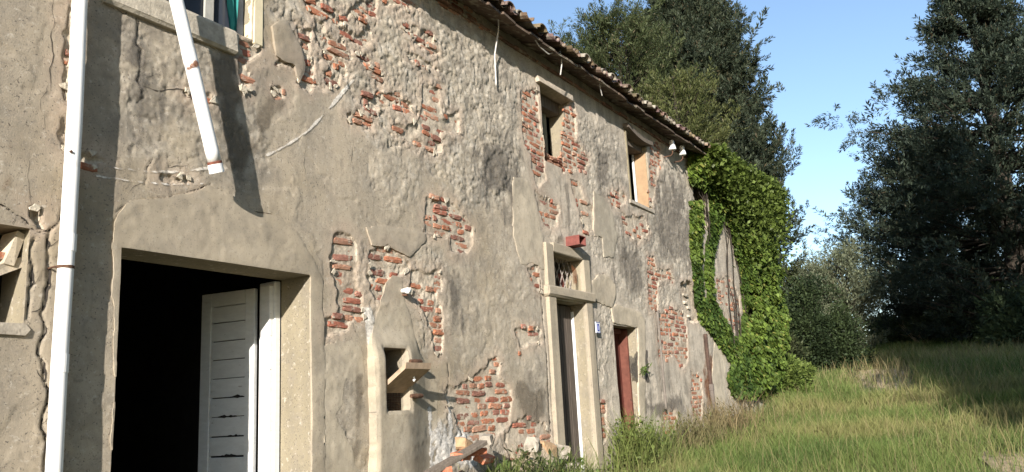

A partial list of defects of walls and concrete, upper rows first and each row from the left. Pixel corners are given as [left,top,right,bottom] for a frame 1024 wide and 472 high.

crack [40,5,55,121]
flaking render [296,0,462,156]
flaking render [28,204,44,229]
flaking render [424,193,475,254]
leakage [474,145,520,208]
flaking render [520,87,560,229]
flaking render [560,102,594,235]
crack [0,156,60,471]
flaking render [324,231,444,356]
flaking render [629,256,704,420]
flaking render [445,357,552,462]